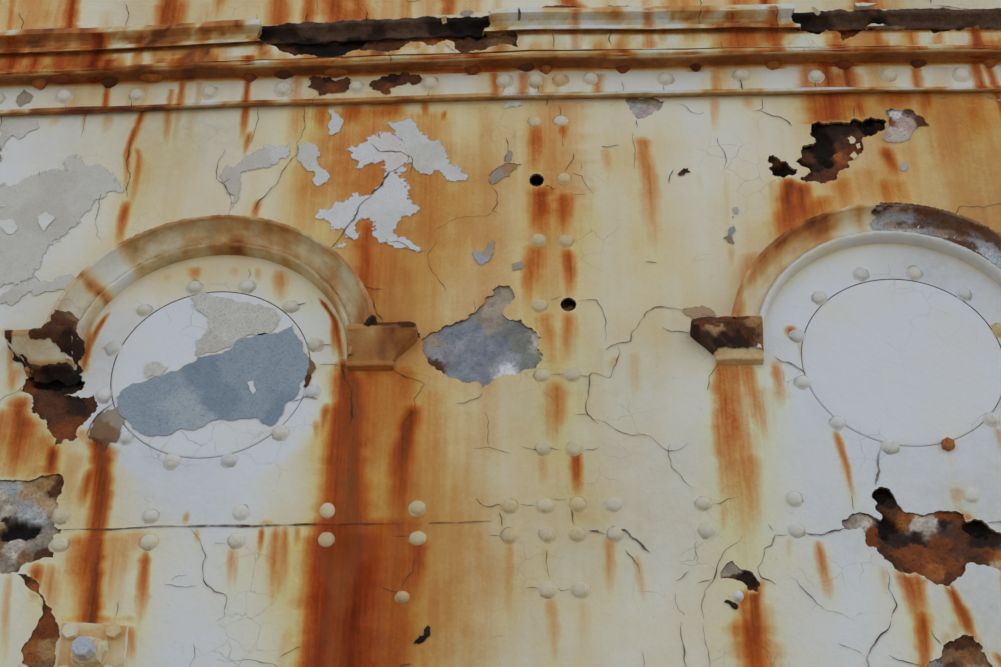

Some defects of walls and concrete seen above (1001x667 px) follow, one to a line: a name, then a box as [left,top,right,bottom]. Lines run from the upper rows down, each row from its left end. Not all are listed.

spalling [257,10,518,57]
spalling [791,3,1001,41]
peeling [315,118,468,252]
rust [4,309,98,466]
rust [398,410,414,467]
crack [577,299,691,487]
spalling [0,475,64,667]
rust [87,442,108,624]
crack [675,543,722,664]
crack [766,498,854,548]
crack [840,575,924,666]
spalling [842,489,1001,586]